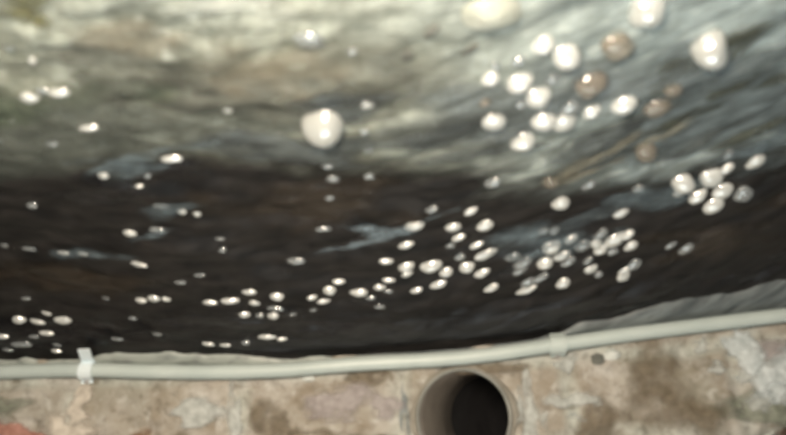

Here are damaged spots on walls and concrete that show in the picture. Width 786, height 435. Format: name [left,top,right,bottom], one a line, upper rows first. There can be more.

leakage [7,0,48,27]
leakage [726,26,772,57]
leakage [0,46,786,360]